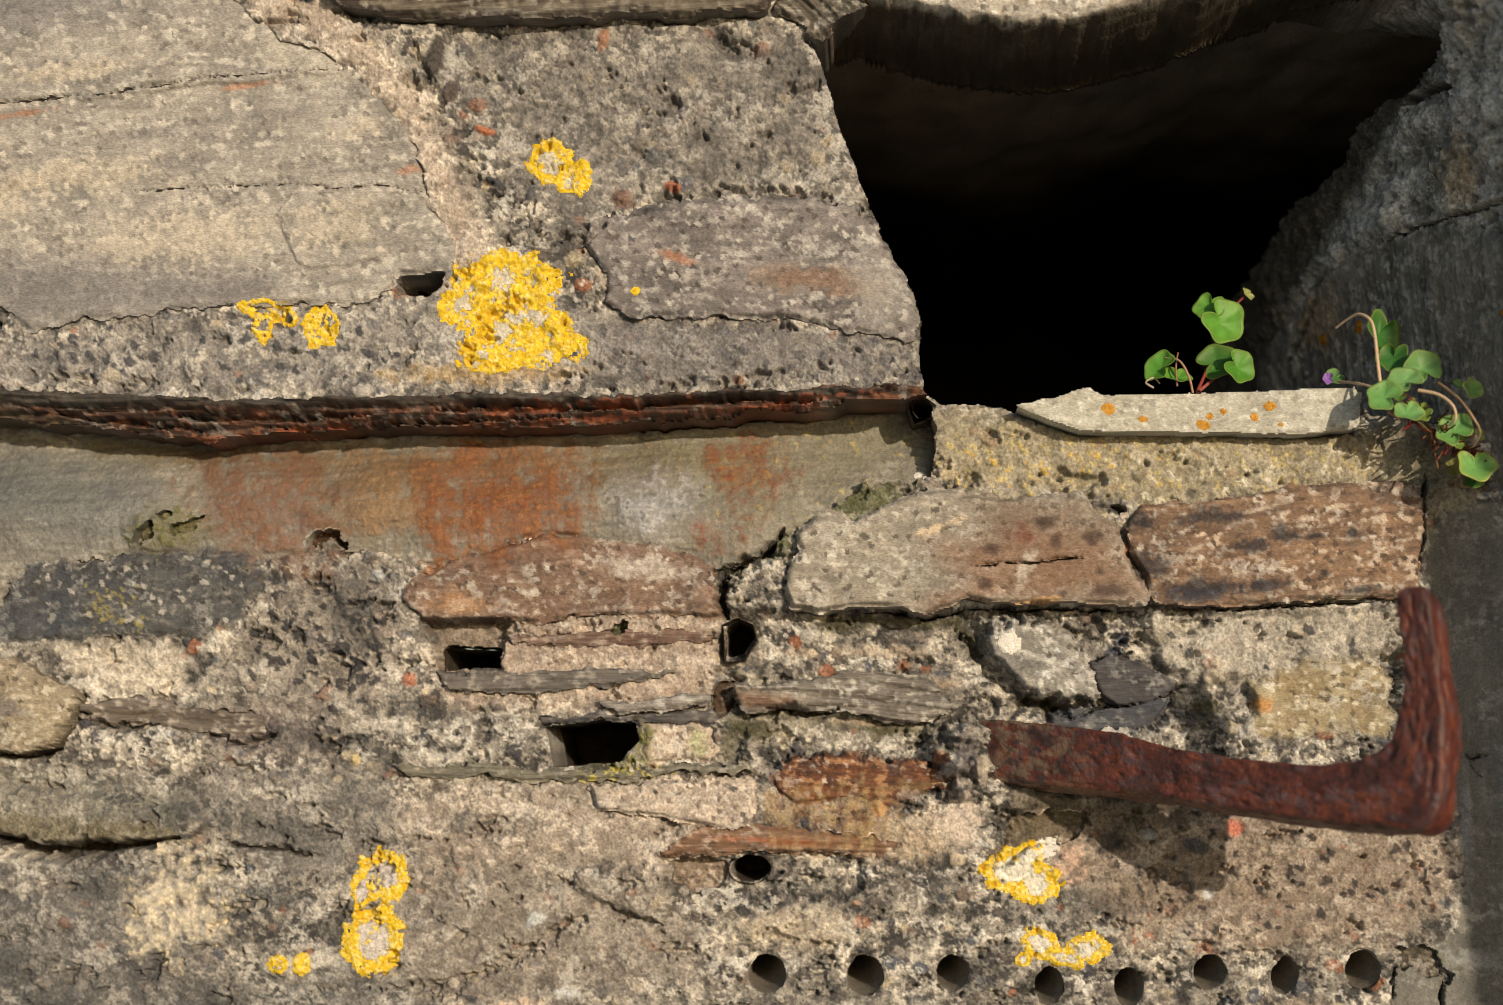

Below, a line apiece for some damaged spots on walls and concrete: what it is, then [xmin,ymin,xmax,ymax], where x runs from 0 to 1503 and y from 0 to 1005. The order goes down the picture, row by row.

rust [419,449,579,554]